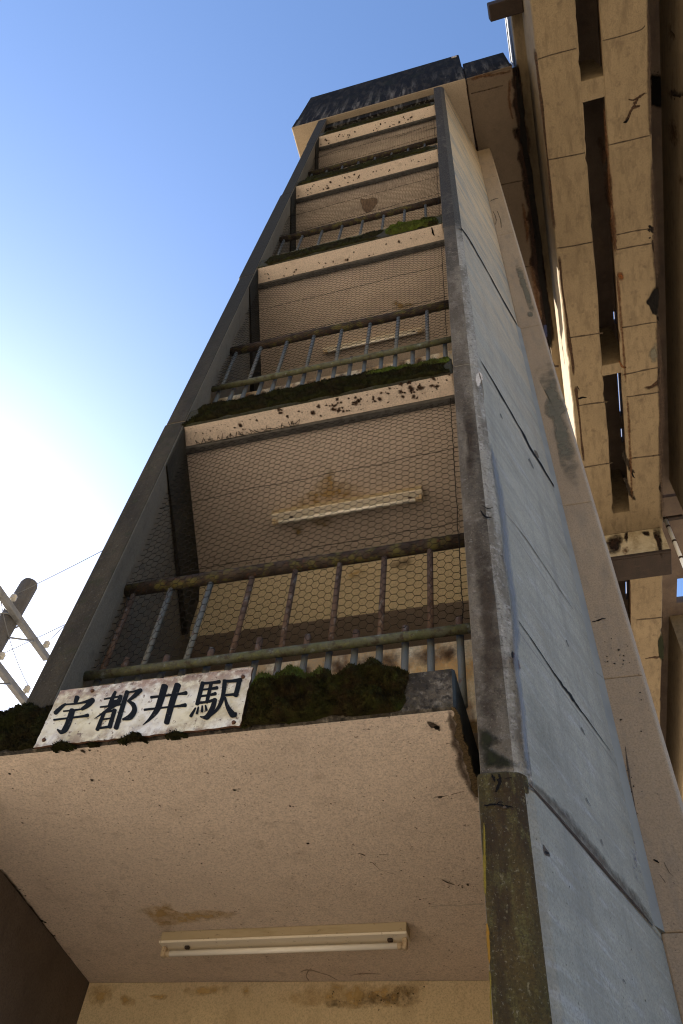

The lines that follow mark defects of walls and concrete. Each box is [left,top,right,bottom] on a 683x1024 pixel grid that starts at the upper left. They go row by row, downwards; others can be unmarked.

crack [623,93,646,123]
water stain [558,258,575,375]
water stain [574,388,584,460]
spalling [427,707,478,798]